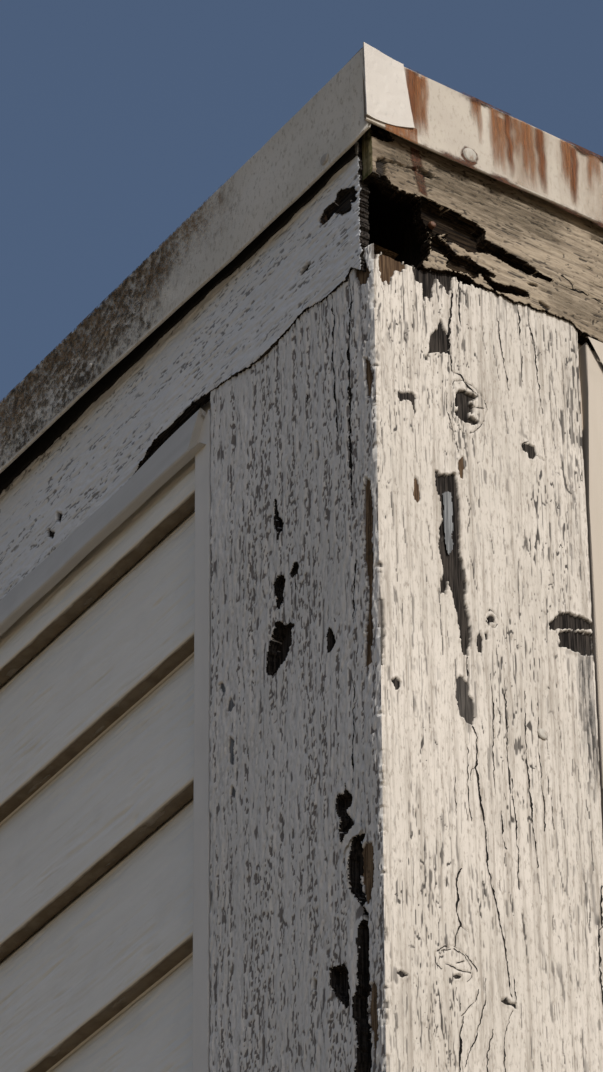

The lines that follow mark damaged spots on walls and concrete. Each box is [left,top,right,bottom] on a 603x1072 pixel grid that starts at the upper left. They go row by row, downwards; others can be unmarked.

peeling [320,186,357,225]
corrosion [385,68,427,196]
corrosion [442,147,478,169]
corrosion [469,95,546,188]
corrosion [561,140,603,196]
peeling [375,255,453,371]
crack [306,285,353,505]
peeling [435,457,473,725]
peeling [341,823,362,854]
crack [435,673,554,1072]